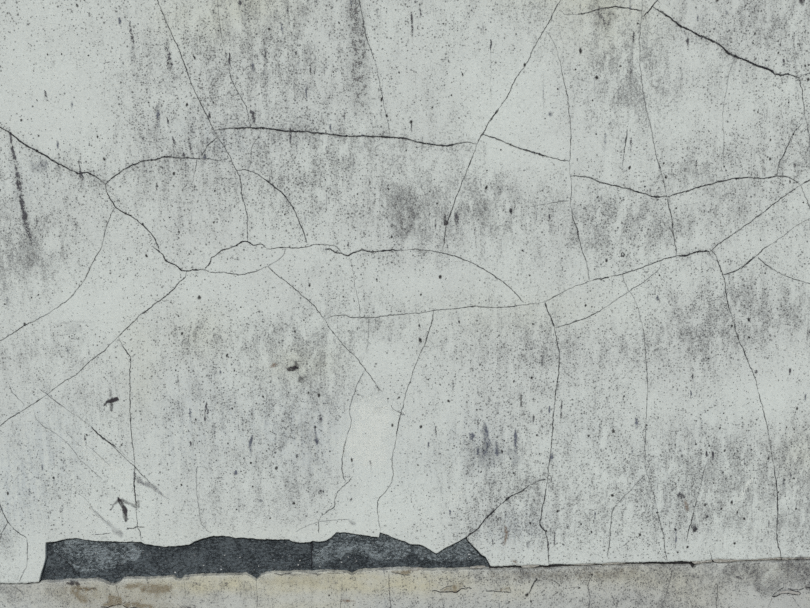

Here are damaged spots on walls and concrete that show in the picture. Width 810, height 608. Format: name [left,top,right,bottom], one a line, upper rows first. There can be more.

crack [581,0,805,110]
crack [0,0,571,536]
crack [467,141,810,592]
peeling [102,594,152,608]
spalling [40,532,489,603]